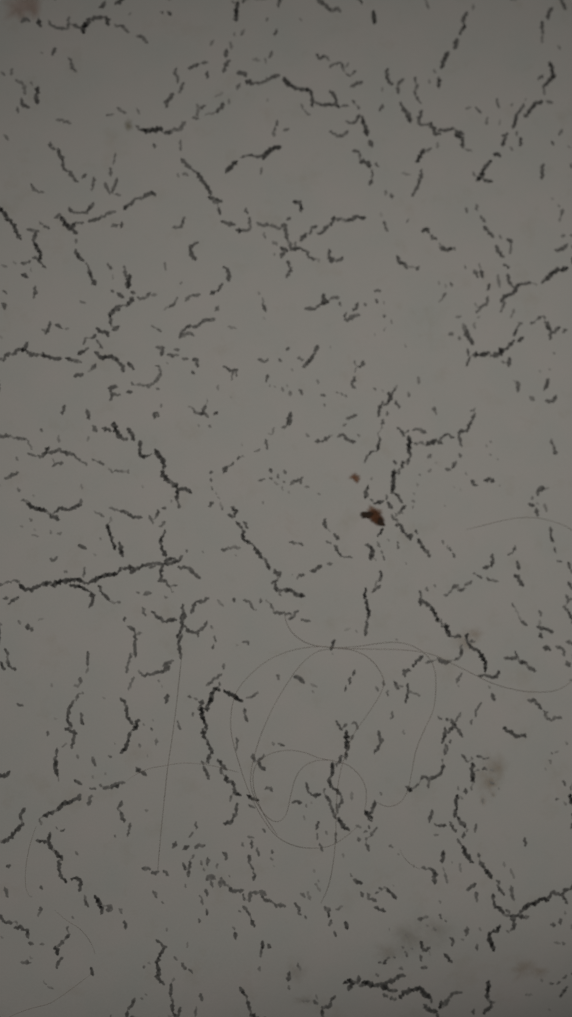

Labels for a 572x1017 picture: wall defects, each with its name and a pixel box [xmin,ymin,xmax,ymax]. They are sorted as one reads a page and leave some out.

crack [0,141,157,286]
crack [135,53,374,278]
crack [384,0,572,367]
crack [0,265,216,677]
crack [221,506,383,637]
rust [361,507,385,526]
crack [314,385,476,558]
crack [402,553,536,703]
crack [0,651,126,915]
crack [197,673,244,826]
crack [405,712,572,952]
crack [320,973,495,1017]